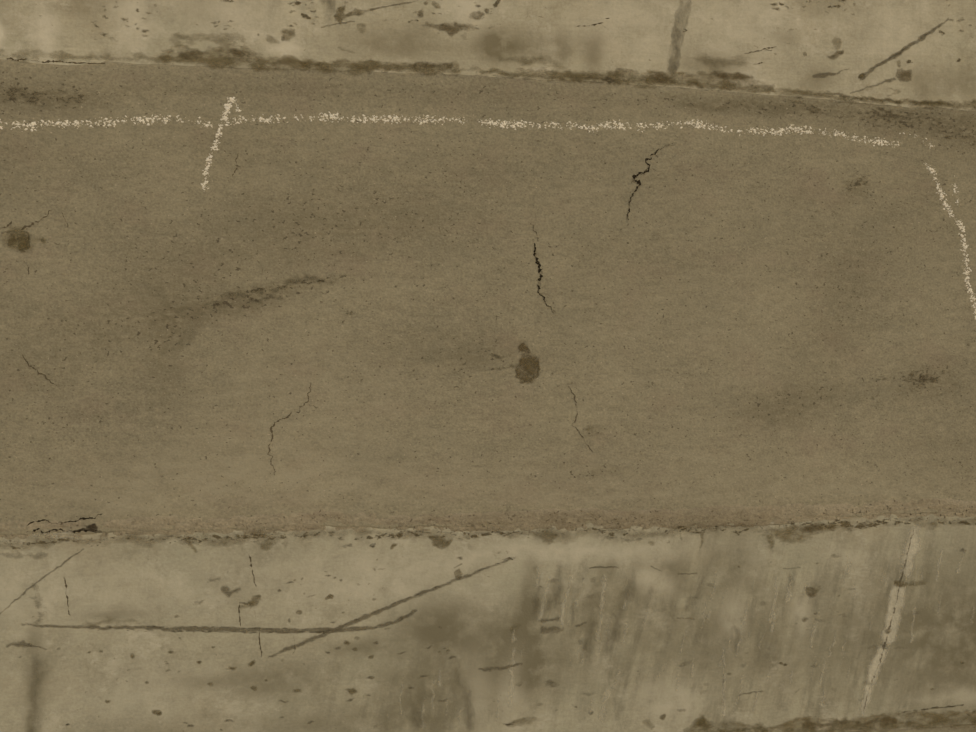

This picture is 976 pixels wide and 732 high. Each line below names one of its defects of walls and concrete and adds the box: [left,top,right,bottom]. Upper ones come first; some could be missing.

crack [627,144,669,220]
crack [533,226,552,310]
crack [267,382,316,475]